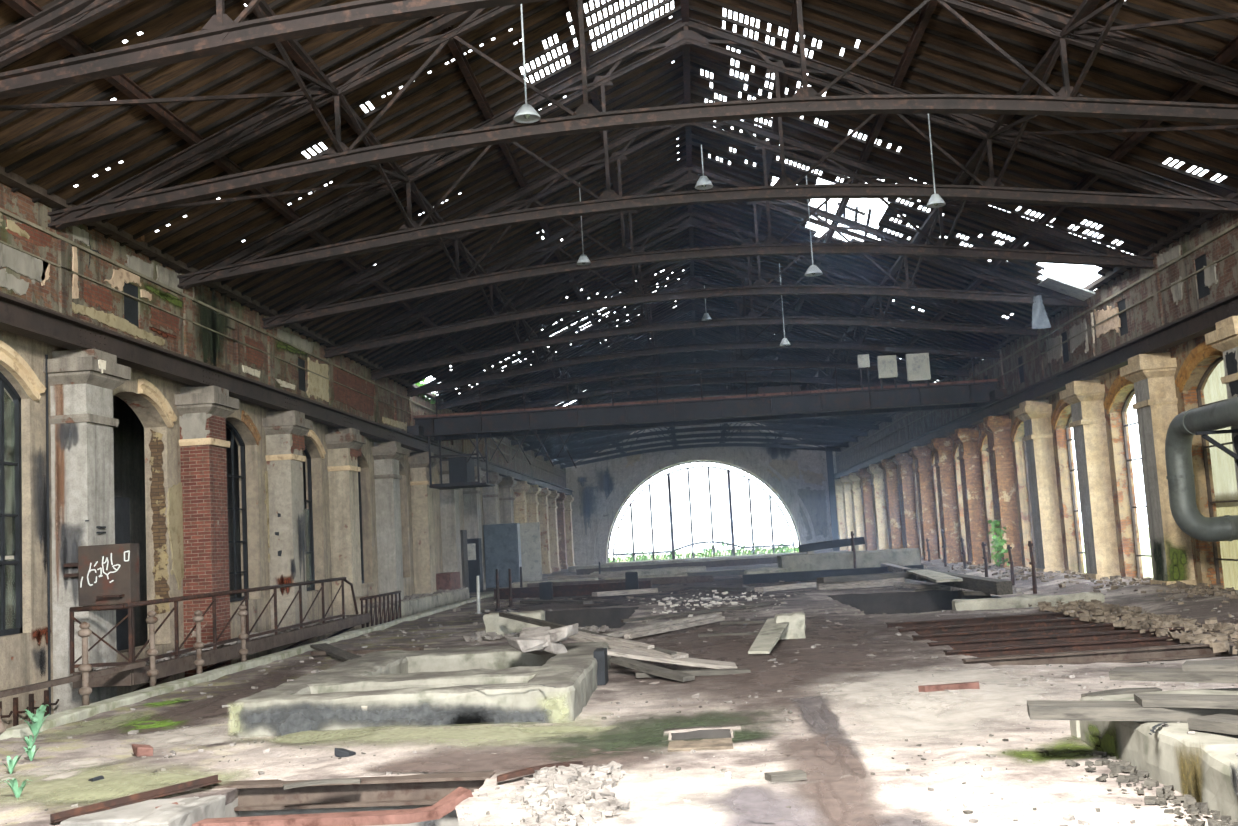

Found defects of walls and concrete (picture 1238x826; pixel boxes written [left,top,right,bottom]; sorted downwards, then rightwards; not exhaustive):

peeling [0,207,52,295]
peeling [72,226,195,346]
peeling [242,365,261,378]
peeling [276,329,329,402]
water stain [59,423,78,450]
water stain [34,452,82,605]
spalling [149,429,184,614]